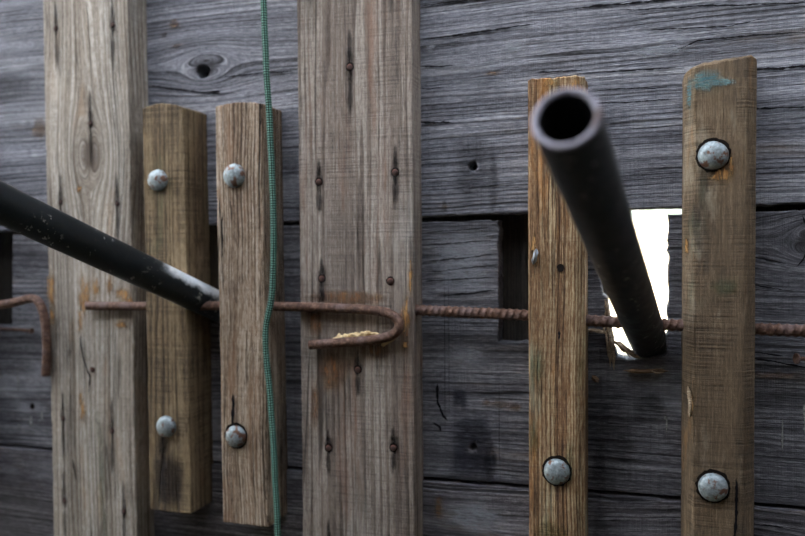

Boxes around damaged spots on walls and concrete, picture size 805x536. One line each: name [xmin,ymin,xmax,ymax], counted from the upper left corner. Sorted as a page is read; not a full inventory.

rust [0,294,52,377]
rust [84,301,146,311]
rust [272,292,407,357]
rust [415,304,529,321]
rust [586,314,622,328]
rust [755,323,805,338]